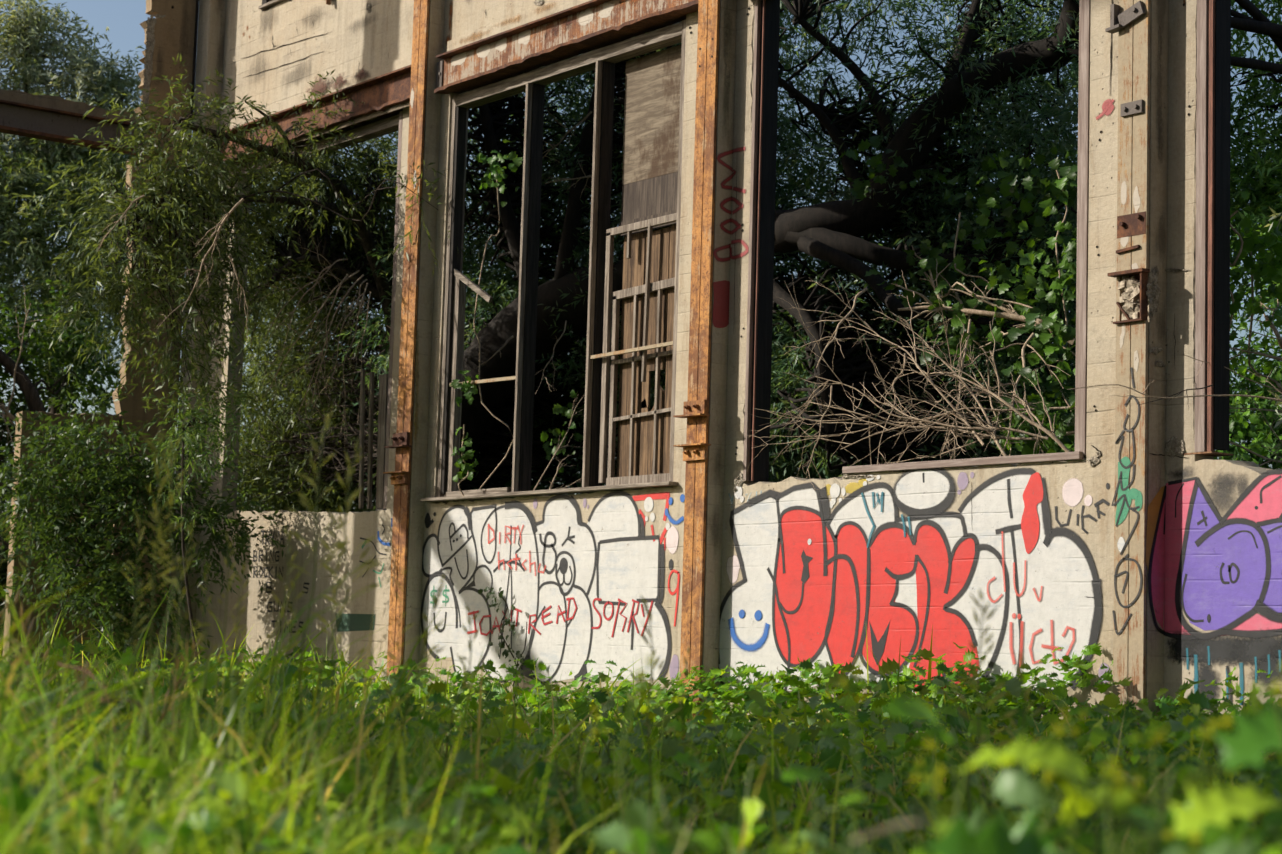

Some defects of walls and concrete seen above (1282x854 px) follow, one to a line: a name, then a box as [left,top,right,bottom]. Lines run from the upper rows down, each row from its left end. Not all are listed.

corrosion [446,3,482,45]
corrosion [307,68,366,99]
peeling [1121,181,1140,213]
spalling [1131,263,1189,320]
peeling [1120,323,1165,372]